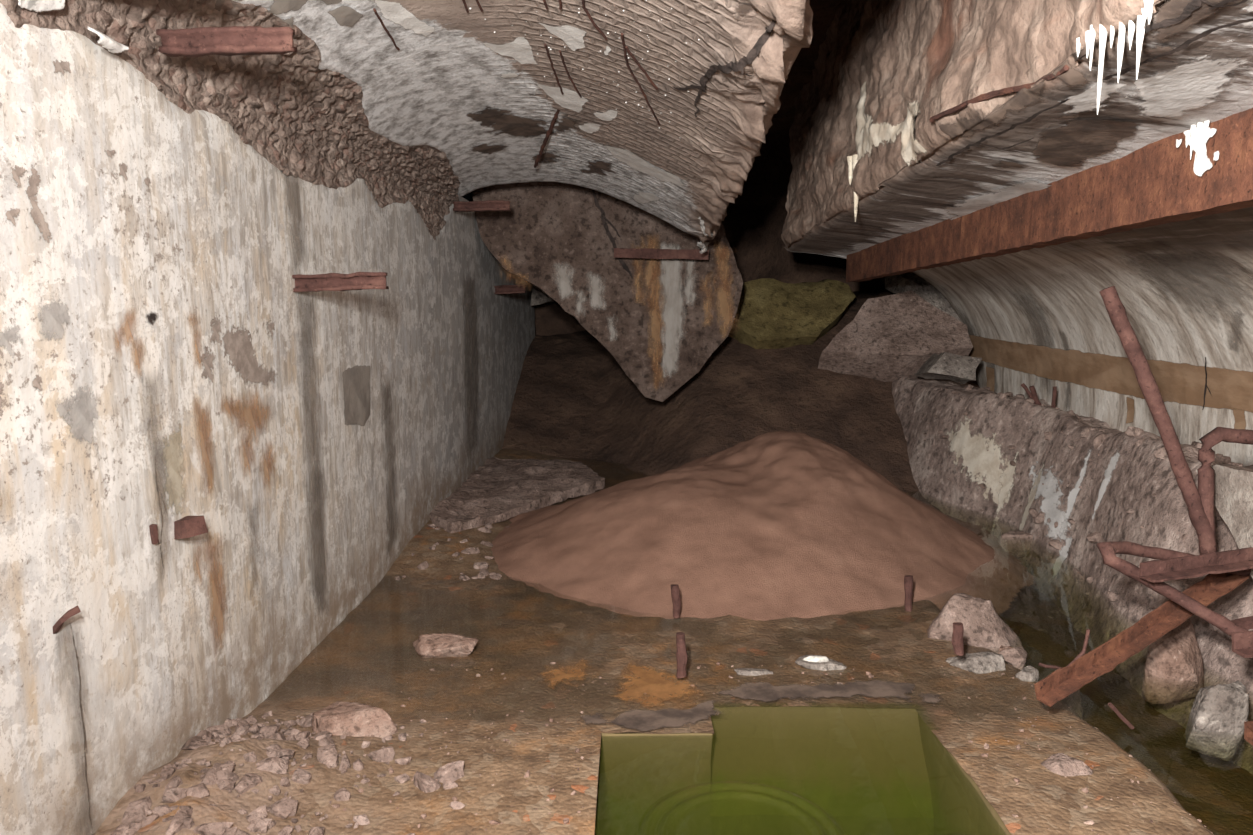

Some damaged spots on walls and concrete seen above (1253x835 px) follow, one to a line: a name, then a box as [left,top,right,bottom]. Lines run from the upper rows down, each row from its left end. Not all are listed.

spalling [0,0,461,243]
leakage [375,0,435,37]
crack [673,19,777,117]
spalling [929,44,1099,140]
spalling [992,116,1141,167]
leakage [1058,55,1247,117]
spalling [1145,0,1226,55]
leakage [1176,123,1219,176]
leakage [464,283,478,451]
crack [1202,357,1212,410]
leakage [302,303,326,601]
rust [196,541,225,641]